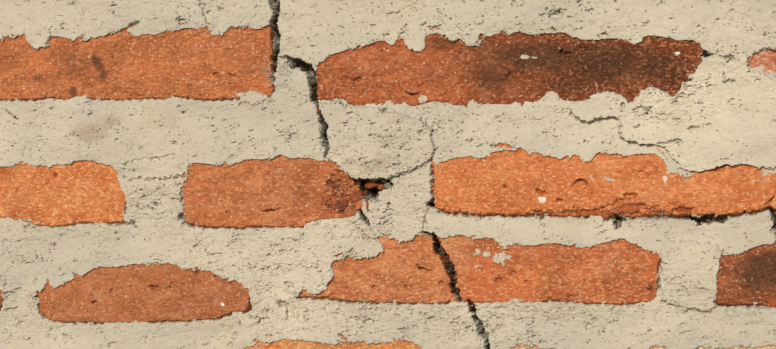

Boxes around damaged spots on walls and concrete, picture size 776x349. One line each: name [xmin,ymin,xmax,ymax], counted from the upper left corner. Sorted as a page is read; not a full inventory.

spalling [319,163,394,219]
spalling [528,193,696,220]
crack [417,235,490,349]
spalling [548,295,576,303]
spalling [645,278,659,297]
spalling [746,297,776,308]